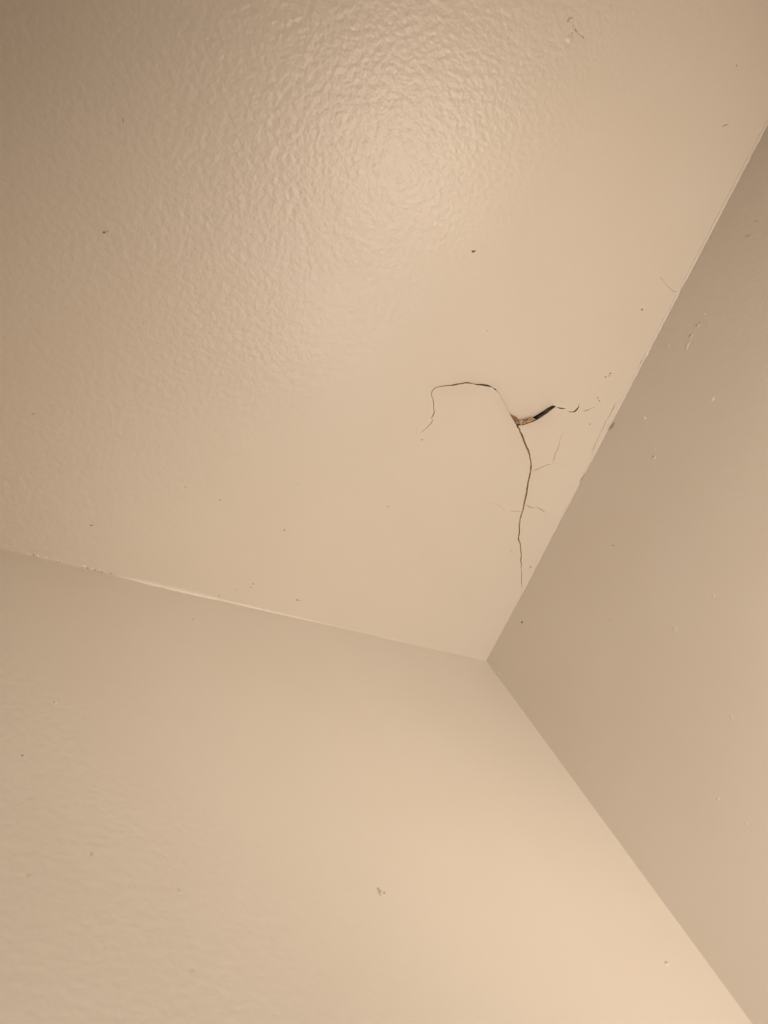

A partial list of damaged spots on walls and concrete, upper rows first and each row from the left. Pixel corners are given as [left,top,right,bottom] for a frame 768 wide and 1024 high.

crack [423,382,589,588]